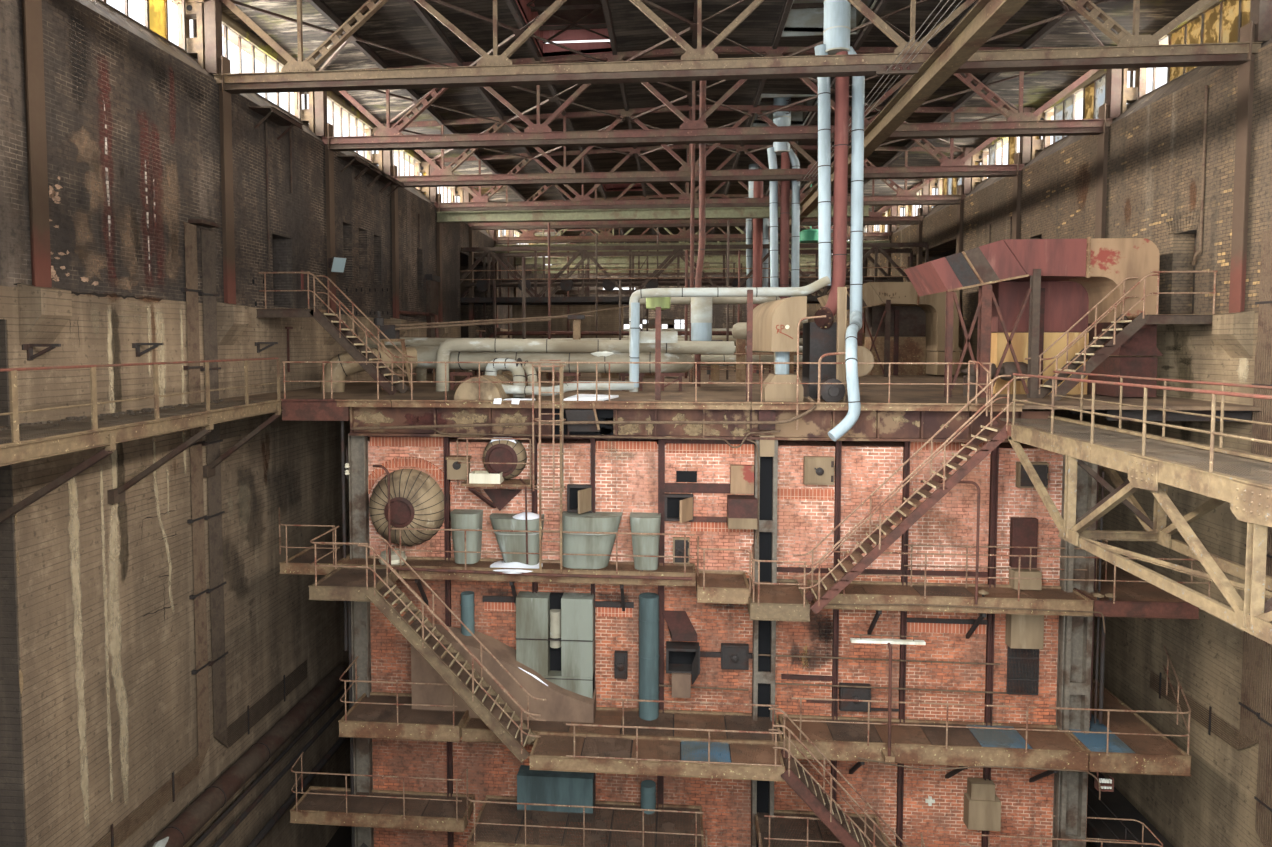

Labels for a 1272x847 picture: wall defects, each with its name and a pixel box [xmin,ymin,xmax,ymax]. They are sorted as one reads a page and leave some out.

flaking render [49,130,105,286]
flaking render [116,215,138,289]
water stain [108,311,122,413]
water stain [70,478,88,807]
water stain [100,442,129,796]